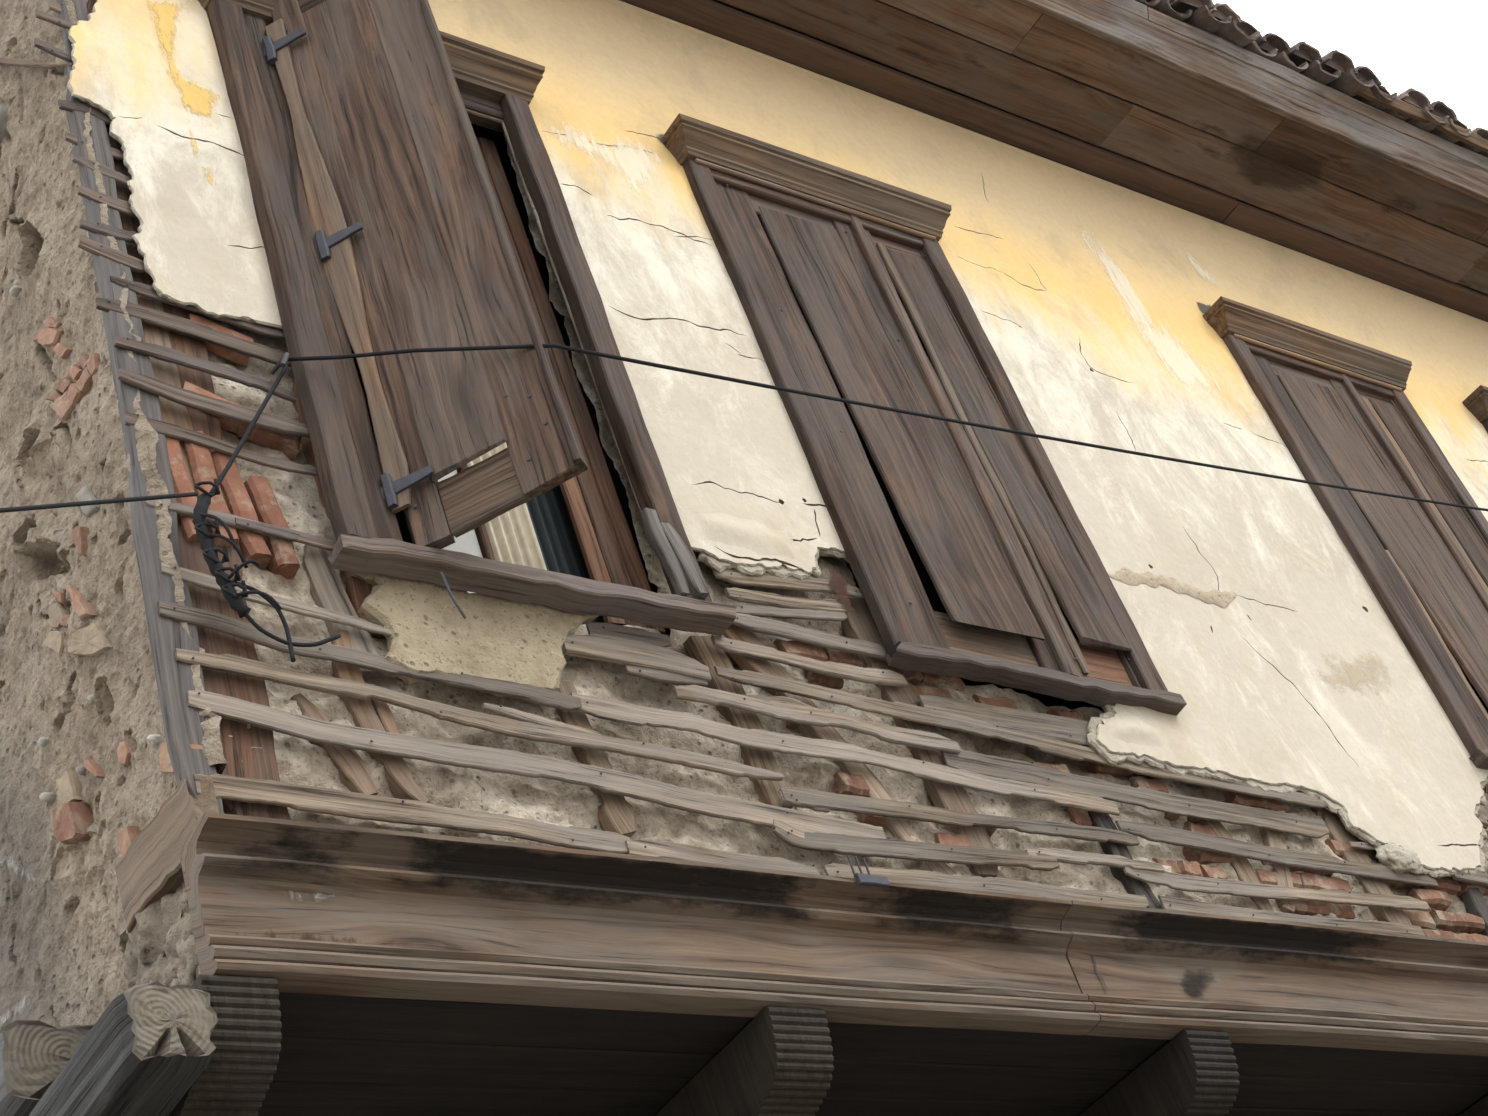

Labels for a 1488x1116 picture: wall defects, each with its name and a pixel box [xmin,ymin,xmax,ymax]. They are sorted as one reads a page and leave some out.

crack [119,113,244,156]
crack [563,184,712,246]
crack [612,307,765,362]
crack [692,481,825,570]
crack [1108,528,1357,764]